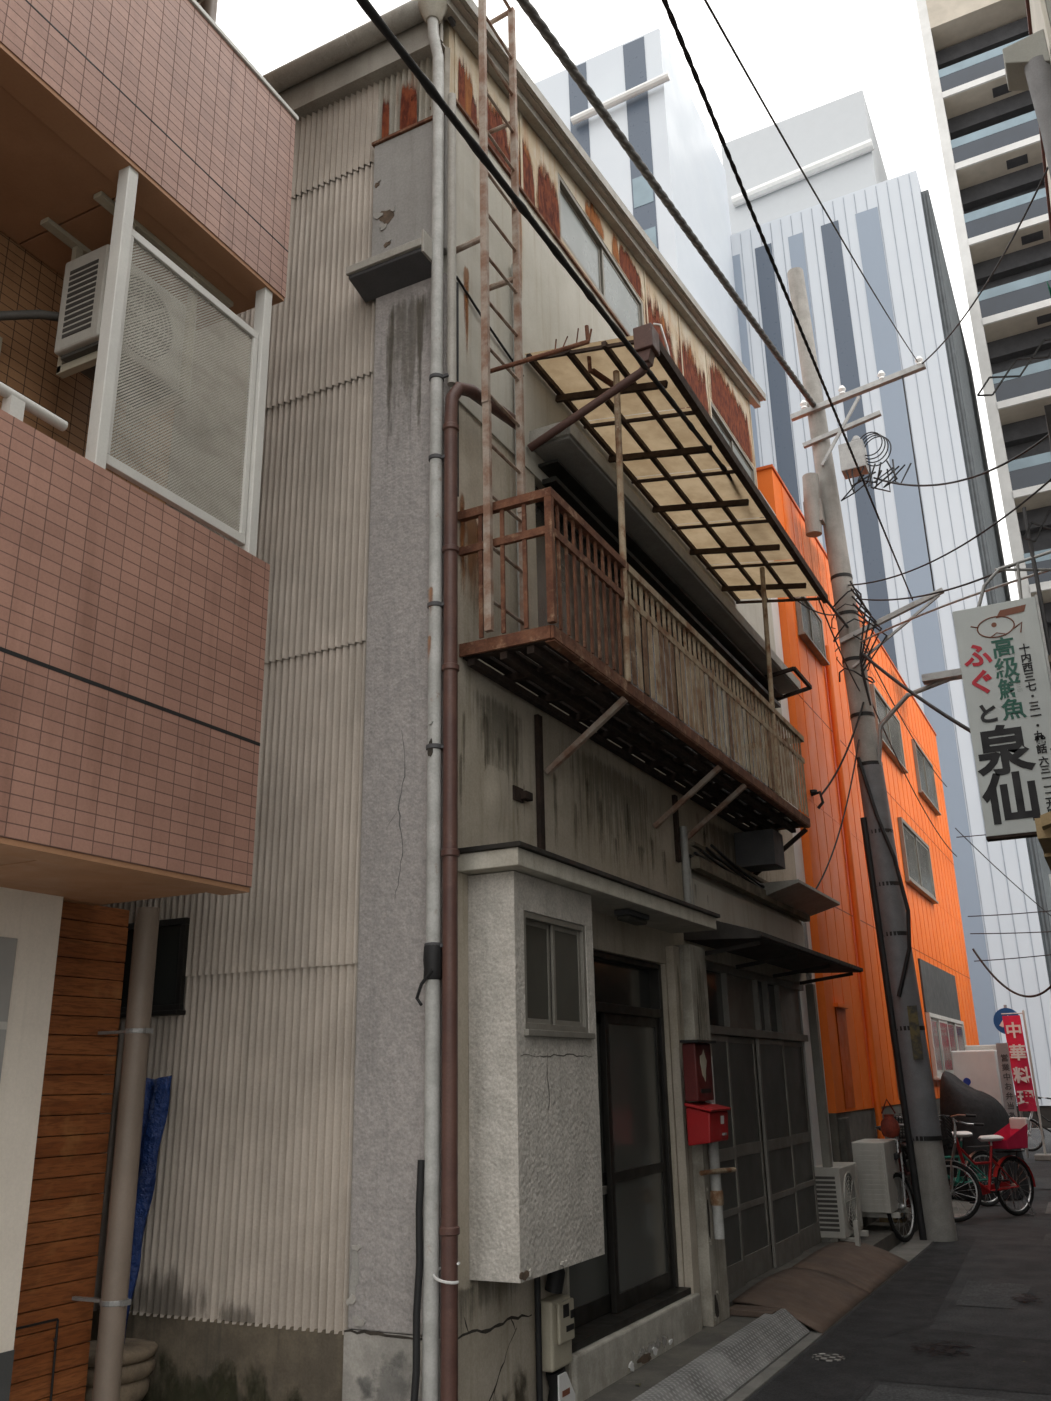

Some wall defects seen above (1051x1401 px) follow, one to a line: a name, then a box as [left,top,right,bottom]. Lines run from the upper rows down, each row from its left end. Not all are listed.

rust [382,84,417,138]
rust [458,60,560,239]
crack [344,1329,422,1340]
crack [458,1314,532,1401]